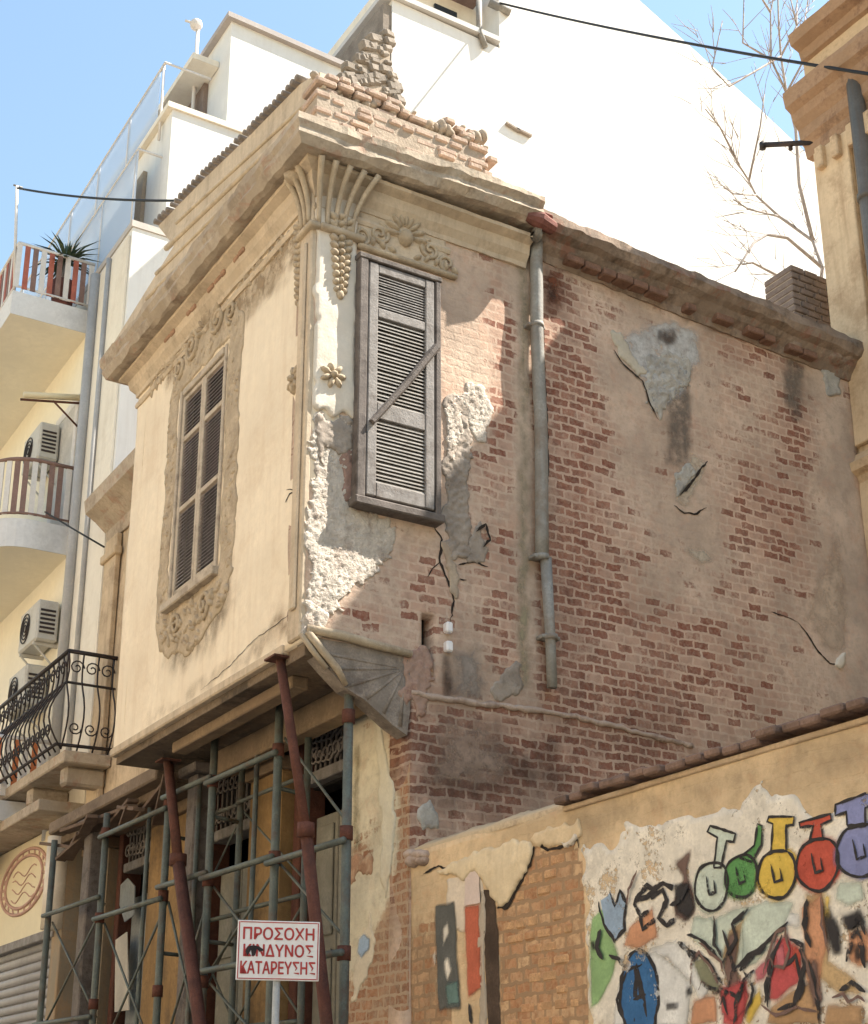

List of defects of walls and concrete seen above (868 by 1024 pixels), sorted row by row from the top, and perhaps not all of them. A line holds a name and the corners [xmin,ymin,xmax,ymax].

flaking render [610,302,699,421]
flaking render [443,382,494,460]
leakage [669,386,690,462]
flaking render [300,410,396,639]
crack [428,529,465,621]
flaking render [459,521,491,567]
crack [773,557,845,665]
flaking render [351,724,396,898]
peeling [437,780,868,1024]
flaking render [351,912,376,1002]